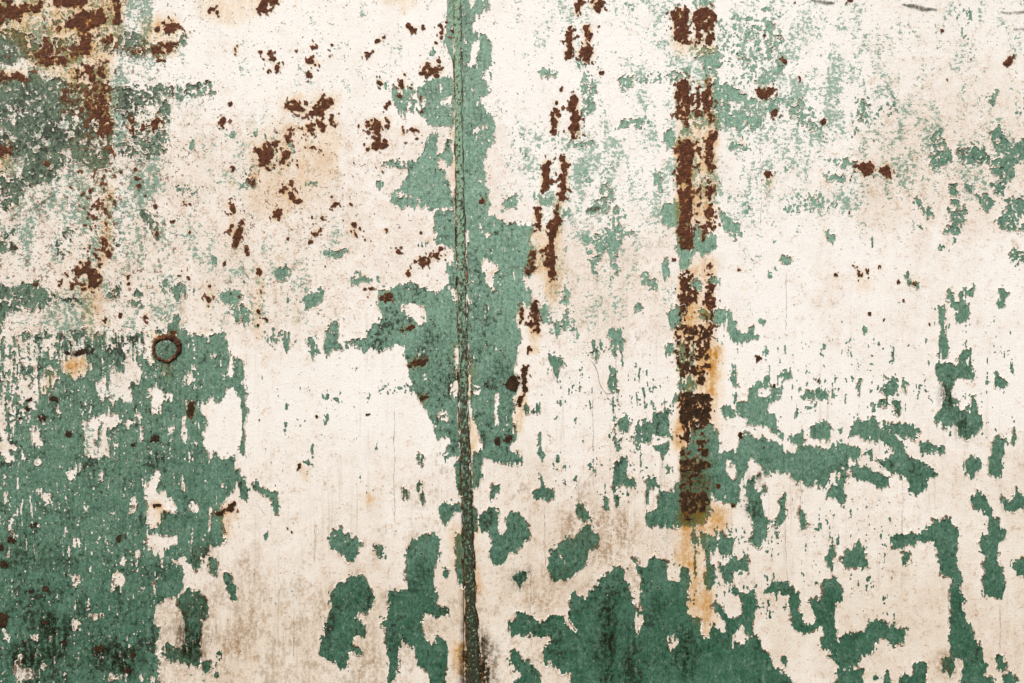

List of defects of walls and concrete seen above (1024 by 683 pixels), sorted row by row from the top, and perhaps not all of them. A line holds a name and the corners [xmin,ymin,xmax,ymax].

peeling [0,228,18,254]
peeling [54,225,76,259]
corrosion [0,0,195,302]
peeling [0,10,217,212]
peeling [139,208,162,241]
corrosion [230,93,340,187]
corrosion [357,20,454,152]
corrosion [522,153,572,282]
corrosion [670,72,721,261]
peeling [0,279,281,683]
peeling [259,0,1024,683]
corrosion [671,262,721,522]